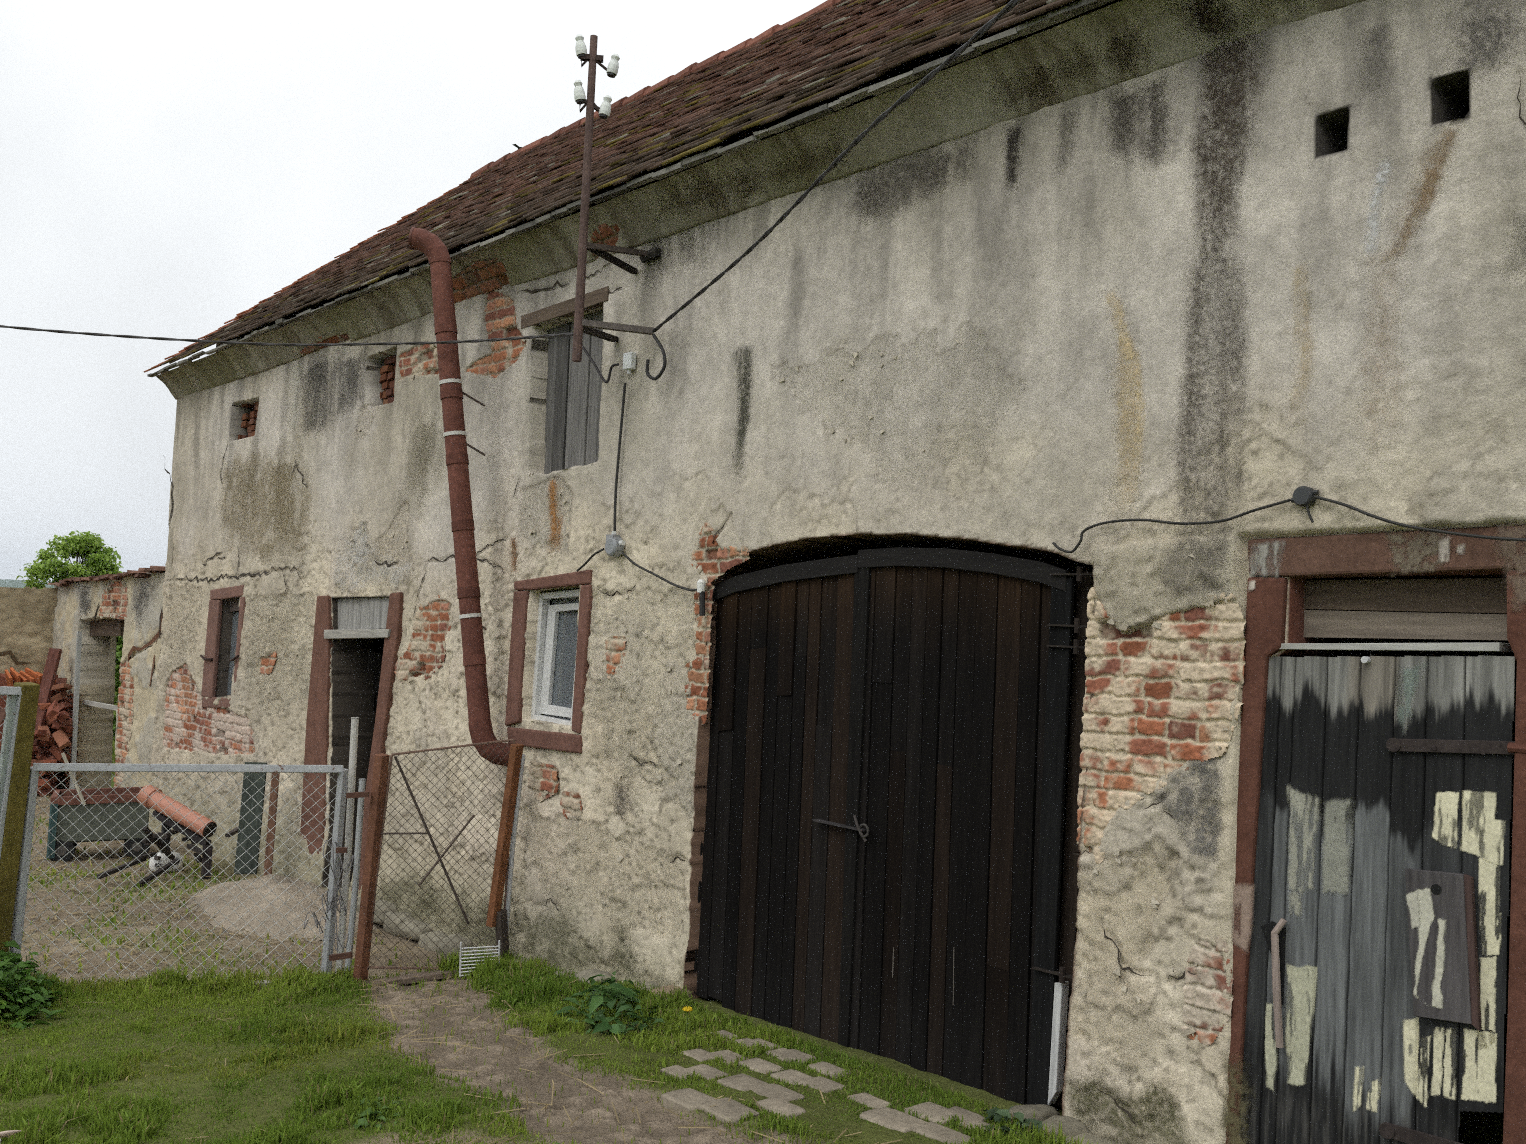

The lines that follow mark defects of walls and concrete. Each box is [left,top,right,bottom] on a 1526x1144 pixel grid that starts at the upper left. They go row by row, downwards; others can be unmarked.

damp [1007,130,1018,182]
damp [1190,0,1257,229]
crack [1517,73,1526,139]
spalling [398,344,439,382]
spalling [452,258,526,378]
spalling [162,586,255,755]
spalling [395,595,452,683]
spalling [589,522,750,815]
spalling [1076,541,1284,985]